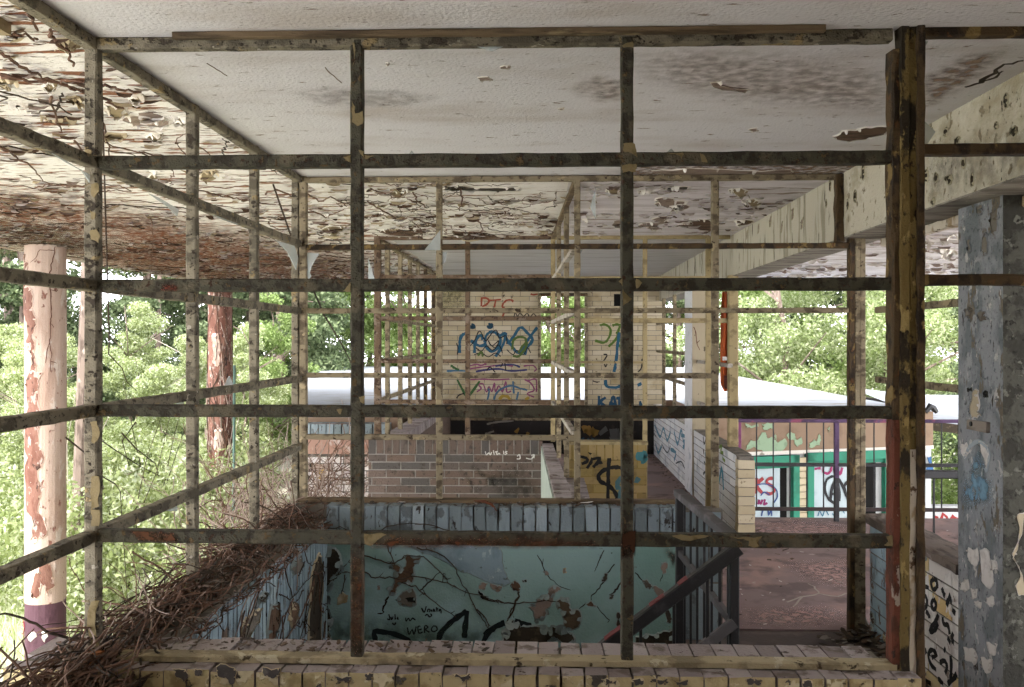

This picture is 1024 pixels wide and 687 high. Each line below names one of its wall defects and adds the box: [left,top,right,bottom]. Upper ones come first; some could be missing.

peeling [0,7,85,150]
peeling [103,69,186,149]
peeling [832,125,887,143]
crack [965,60,1023,88]
peeling [0,144,186,277]
peeling [364,143,803,275]
peeling [22,285,43,413]
peeling [24,426,48,541]
peeling [377,545,527,607]
crack [507,592,520,621]
peeling [501,568,597,647]
crack [537,550,663,622]